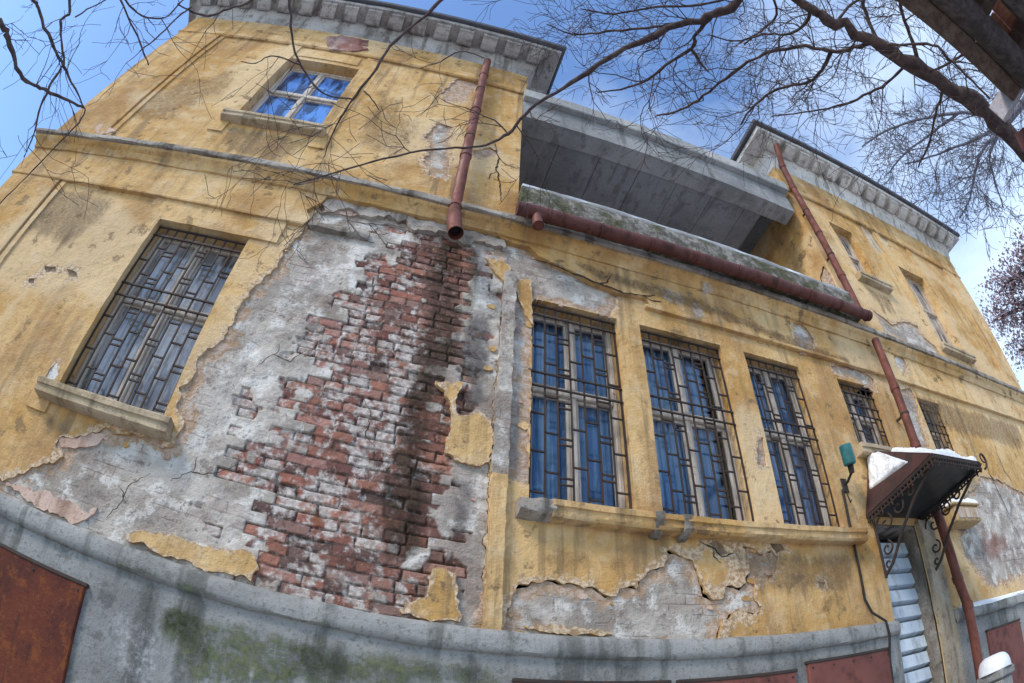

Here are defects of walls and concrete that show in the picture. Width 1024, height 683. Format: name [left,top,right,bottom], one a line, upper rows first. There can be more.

flaking render [326,35,369,52]
peeling [442,80,478,102]
peeling [424,124,451,179]
flaking render [0,199,616,628]
water stain [383,245,488,556]
crack [106,458,239,518]
spalling [959,476,1024,588]
spalling [504,544,784,639]